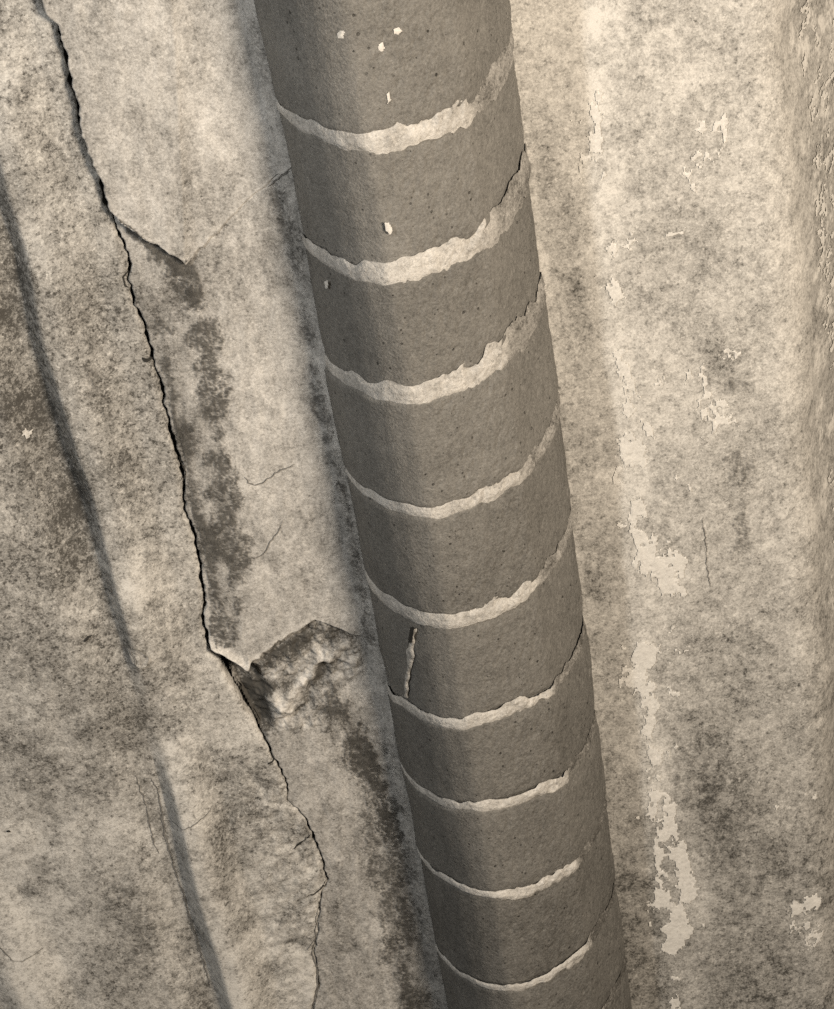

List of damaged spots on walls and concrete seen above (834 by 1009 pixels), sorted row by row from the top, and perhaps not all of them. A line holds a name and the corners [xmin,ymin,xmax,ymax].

crack [58,25,82,132]
water stain [119,219,253,649]
crack [99,178,288,789]
spalling [227,620,365,737]
crack [135,775,212,987]
crack [294,818,328,1009]
water stain [318,684,429,1009]
peeling [619,641,705,956]
peeling [787,893,824,947]